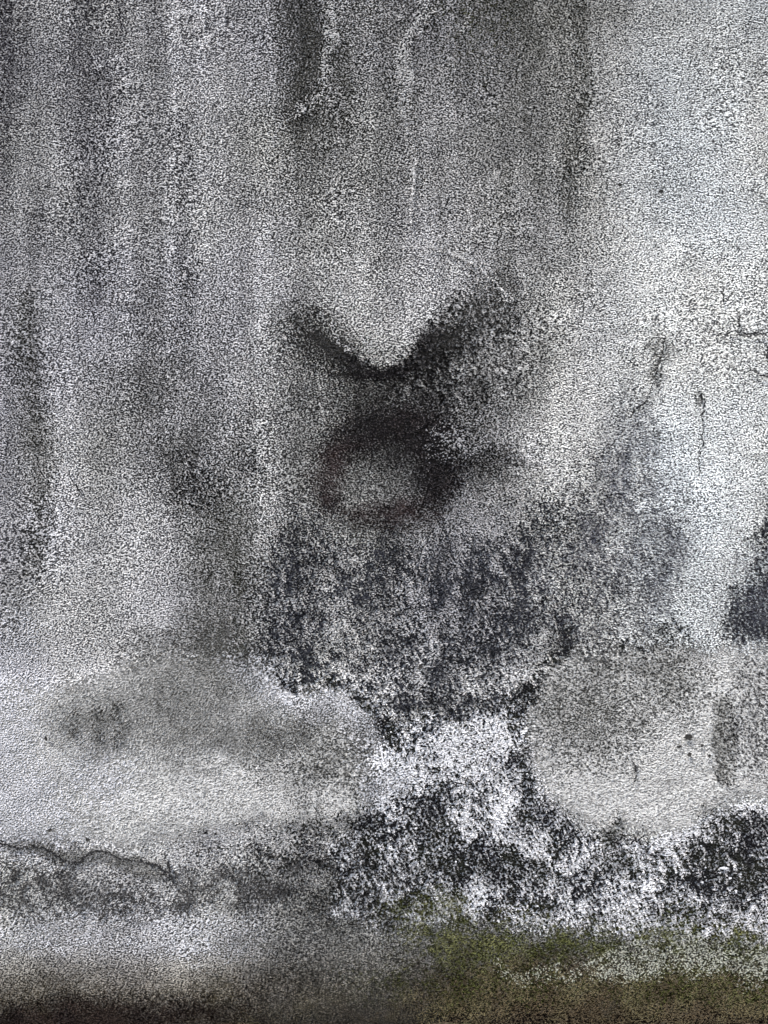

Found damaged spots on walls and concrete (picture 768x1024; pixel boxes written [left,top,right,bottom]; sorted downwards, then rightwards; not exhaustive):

leakage [644,332,678,386]
leakage [701,490,768,669]
crack [0,840,176,886]
leakage [496,958,582,987]
leakage [447,1008,768,1024]